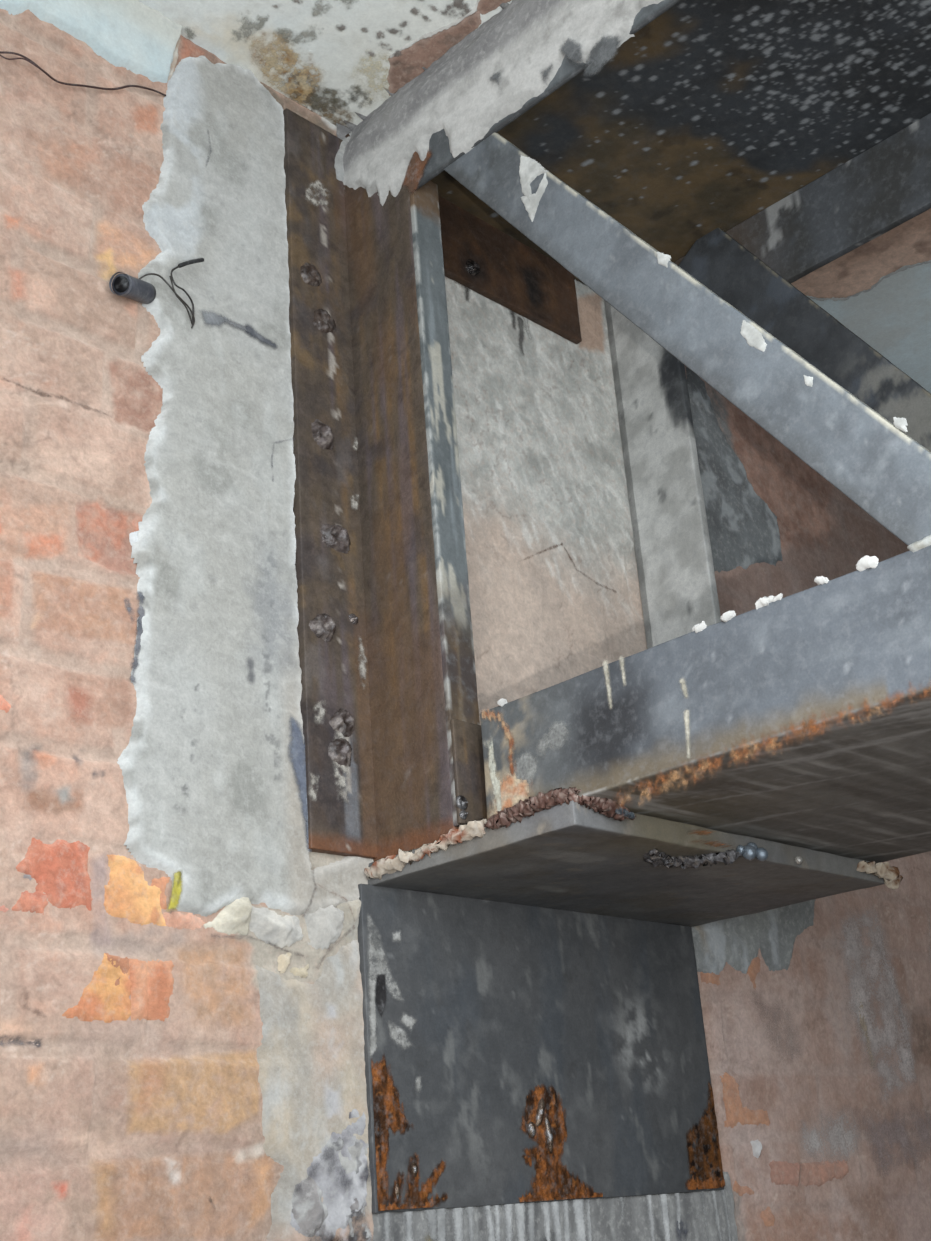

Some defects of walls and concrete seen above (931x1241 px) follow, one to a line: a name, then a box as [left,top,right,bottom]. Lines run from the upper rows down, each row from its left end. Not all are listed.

damp [255,34,351,127]
flaking render [362,0,511,96]
corrosion [482,709,529,816]
corrosion [619,721,826,805]
spalling [0,837,361,978]
spalling [62,953,174,1023]
corrosion [330,1057,447,1241]
corrosion [519,1086,603,1202]
corrosion [686,1082,725,1190]